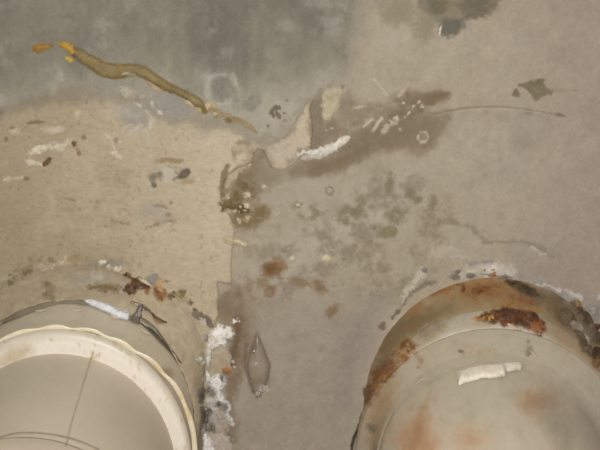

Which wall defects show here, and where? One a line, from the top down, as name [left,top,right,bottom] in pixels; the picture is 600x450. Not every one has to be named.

damp [418,0,500,39]
crack [32,42,257,134]
crack [418,106,564,116]
damp [249,91,450,198]
damp [372,210,406,238]
corrosion [90,272,167,301]
corrosion [431,278,580,336]
damp [168,288,256,450]
corrosion [363,338,415,405]